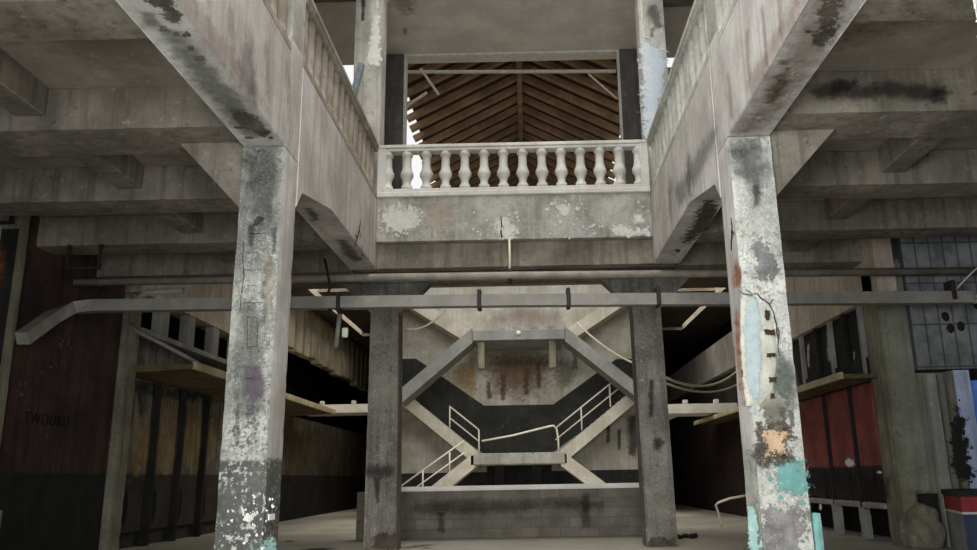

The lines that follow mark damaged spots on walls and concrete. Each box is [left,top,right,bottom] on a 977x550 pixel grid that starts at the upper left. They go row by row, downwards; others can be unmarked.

peeling [366,0,383,67]
peeling [637,27,670,139]
water stain [813,81,943,102]
peeling [376,202,424,238]
peeling [472,211,520,240]
peeling [545,200,651,238]
crack [739,289,780,353]
spalling [741,297,822,550]
peeling [221,494,277,550]